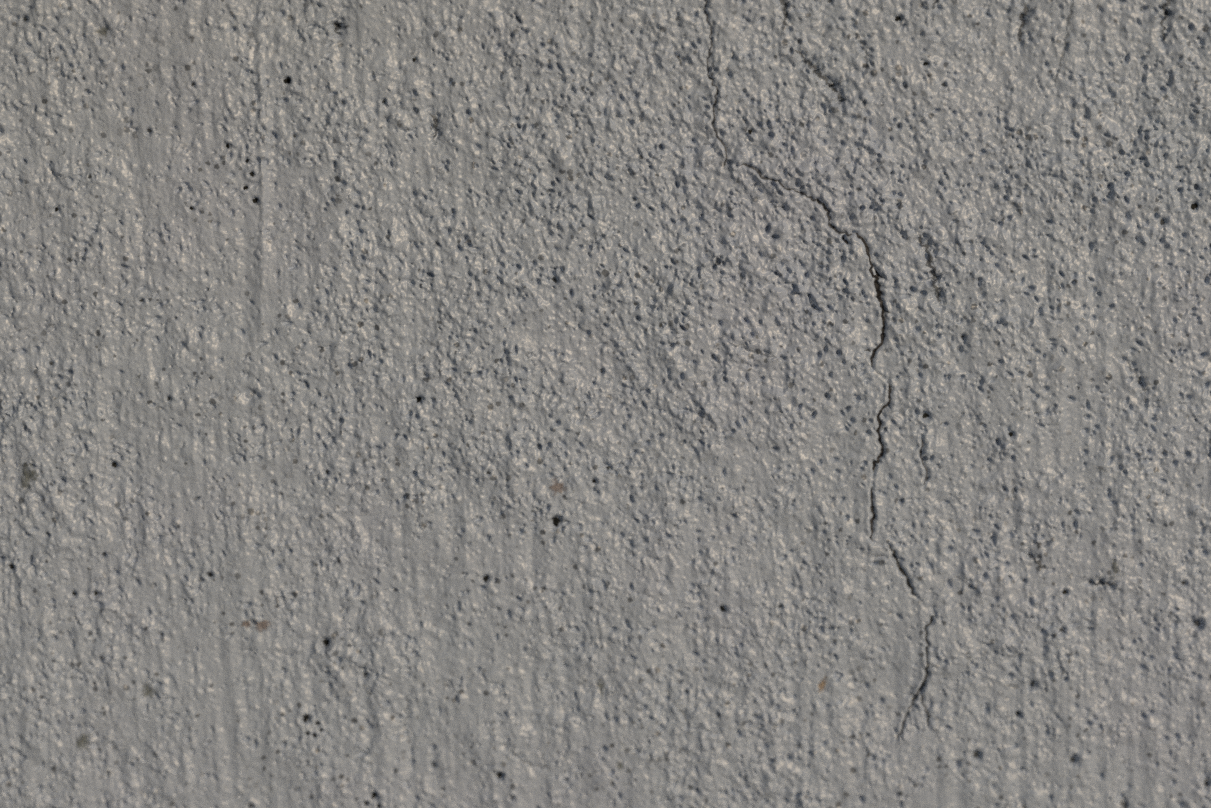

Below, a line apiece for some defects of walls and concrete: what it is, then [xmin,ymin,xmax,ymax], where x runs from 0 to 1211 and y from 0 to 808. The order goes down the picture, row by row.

crack [704,0,934,739]